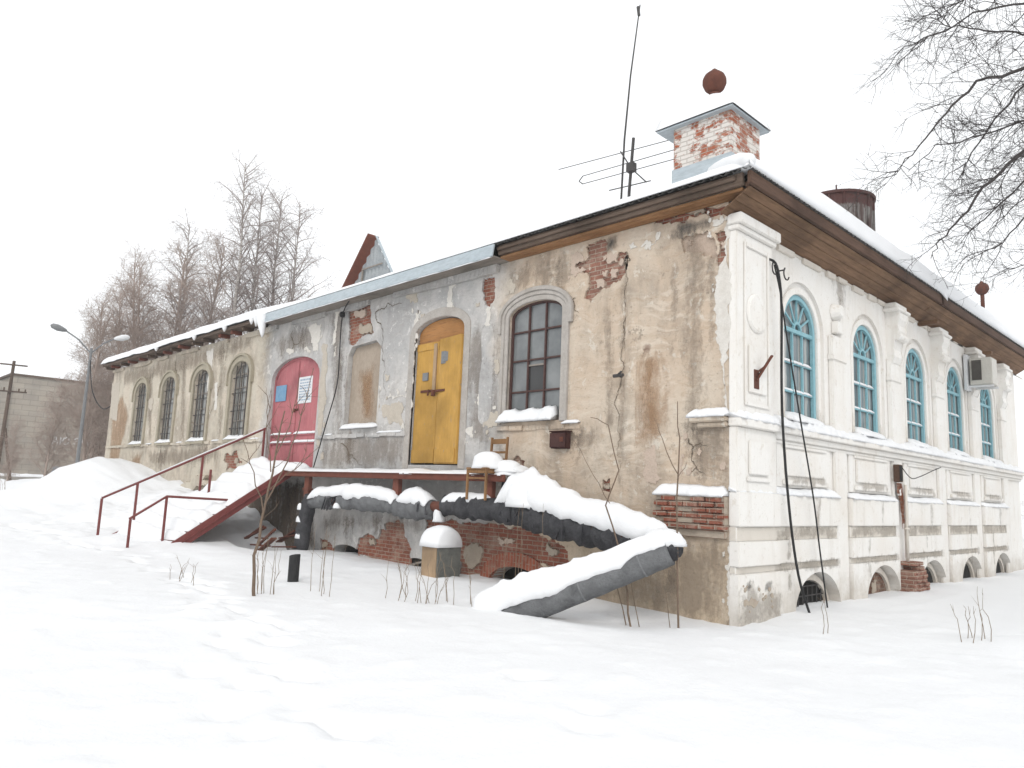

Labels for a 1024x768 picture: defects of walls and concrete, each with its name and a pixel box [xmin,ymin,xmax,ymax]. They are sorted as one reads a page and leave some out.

spalling [483,275,519,326]
spalling [568,206,732,408]
spalling [286,305,374,461]
spalling [225,451,242,469]
crack [688,439,706,474]
spalling [358,520,412,564]
spalling [427,519,569,578]